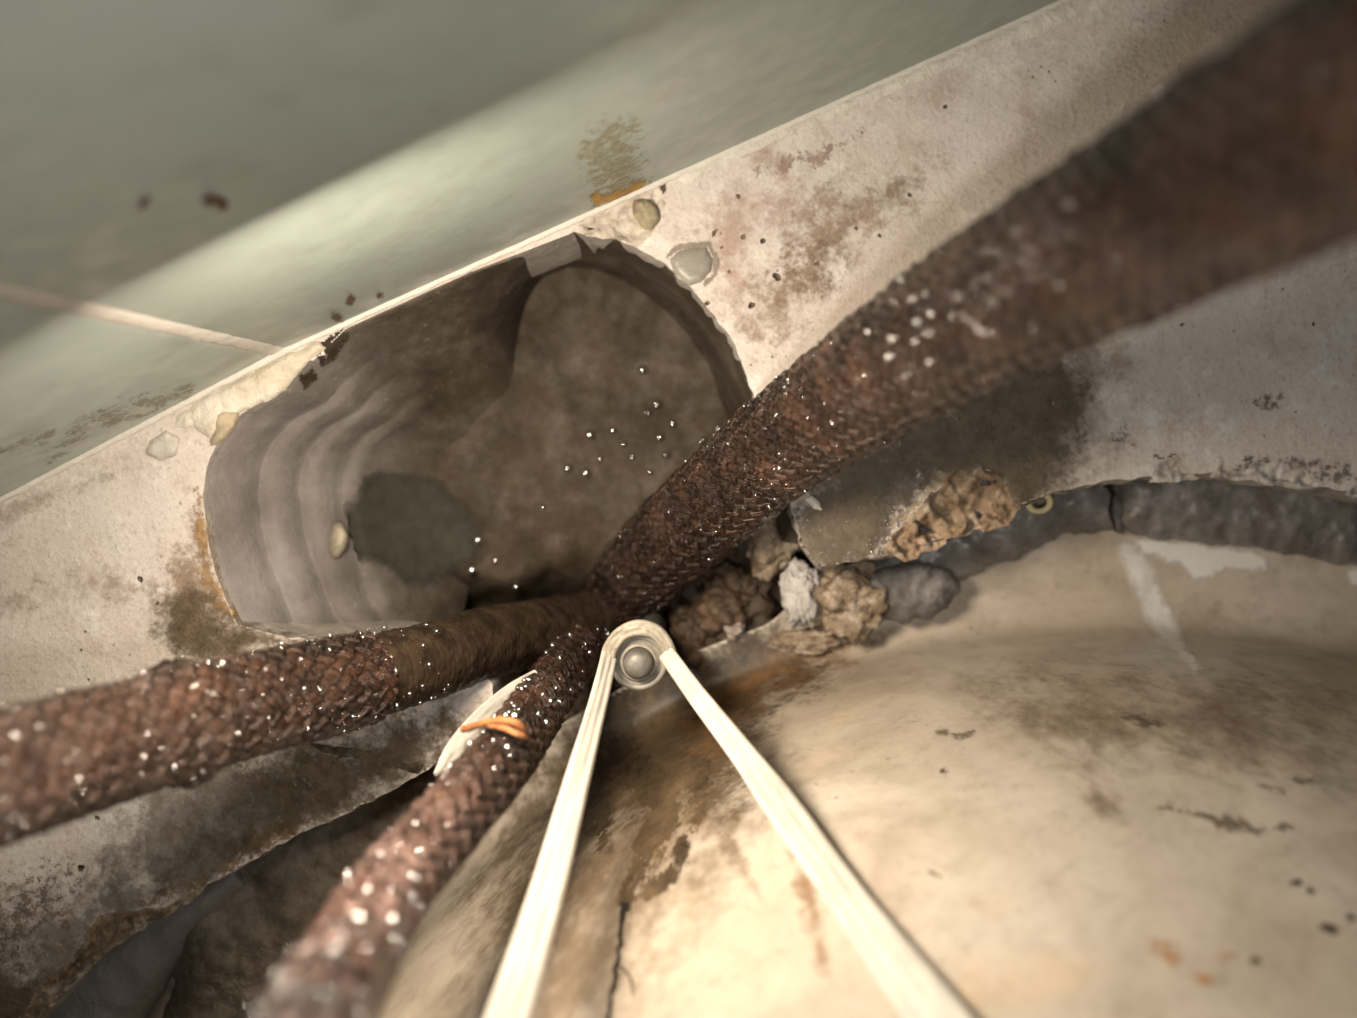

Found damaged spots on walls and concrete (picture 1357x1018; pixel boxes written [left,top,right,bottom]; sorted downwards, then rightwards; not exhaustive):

rust [590,179,646,207]
rust [753,131,863,179]
rust [757,181,907,336]
damp [0,706,457,1018]
crack [606,902,633,1018]